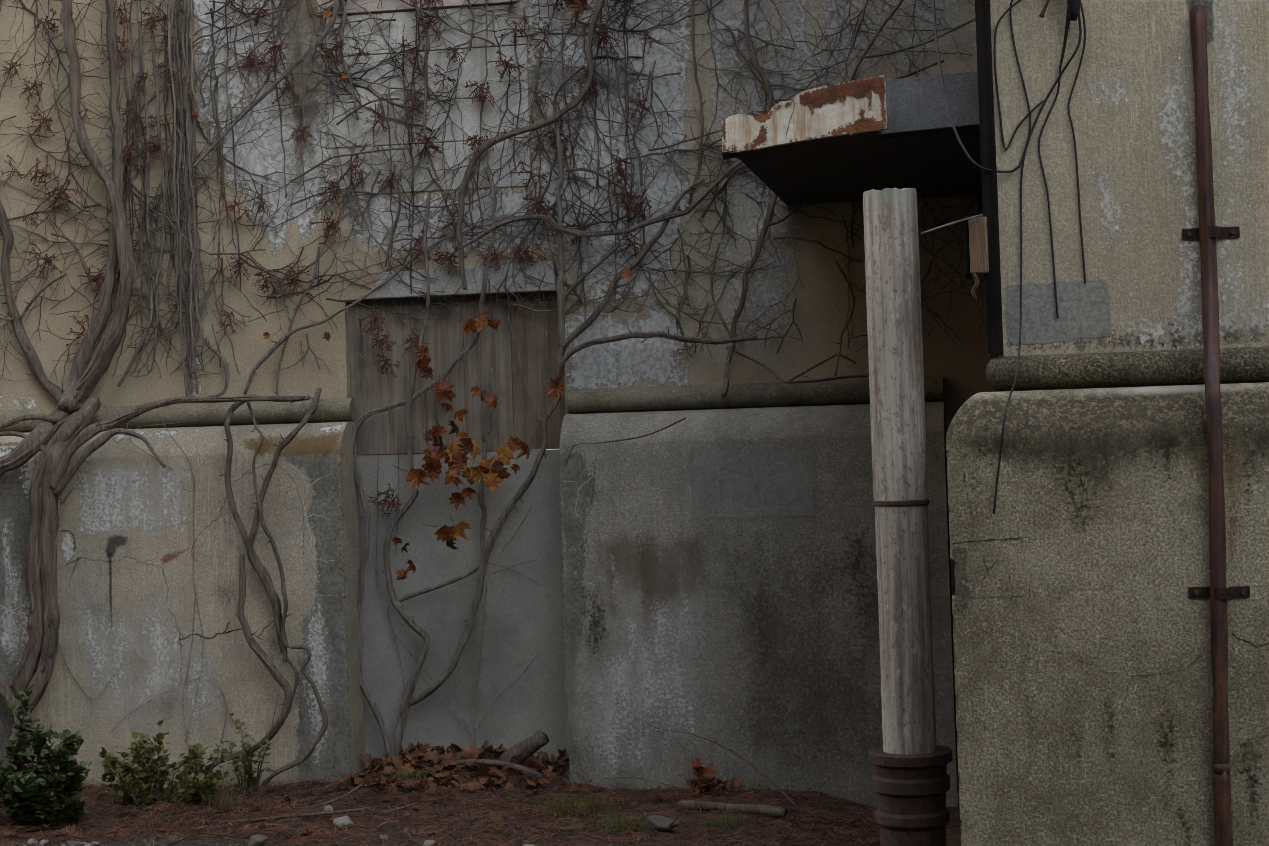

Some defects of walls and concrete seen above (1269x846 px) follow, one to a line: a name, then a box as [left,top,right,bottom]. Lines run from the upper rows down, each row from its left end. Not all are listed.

rust [722,76,887,154]
leakage [1011,324,1203,353]
leakage [979,422,1200,528]
crack [65,556,273,683]
leakage [574,536,704,778]
crack [1021,633,1269,708]